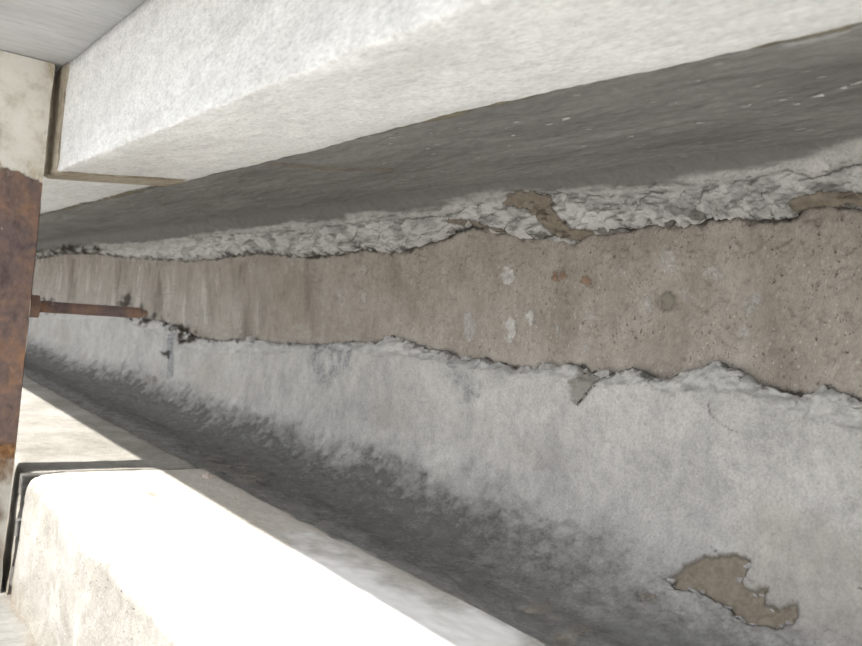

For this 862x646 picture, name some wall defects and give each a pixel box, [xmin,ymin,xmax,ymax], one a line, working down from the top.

corrosion [0,167,43,480]
damp [33,244,208,375]
flaking render [32,190,862,408]
damp [24,345,594,646]